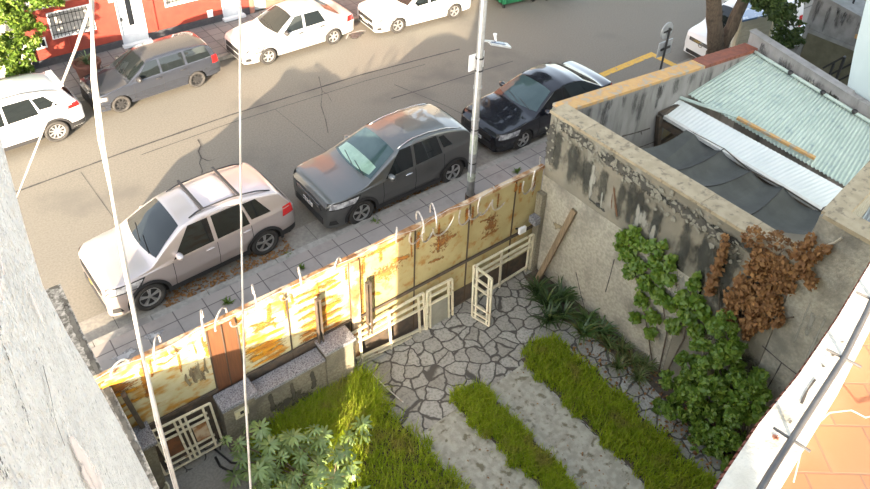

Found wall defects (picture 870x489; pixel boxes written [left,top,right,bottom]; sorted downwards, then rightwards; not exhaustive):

rust [238,268,348,368]
rust [361,223,456,323]
rust [465,194,500,240]
leakage [552,132,670,240]
peeling [545,107,742,264]
leakage [671,222,752,310]